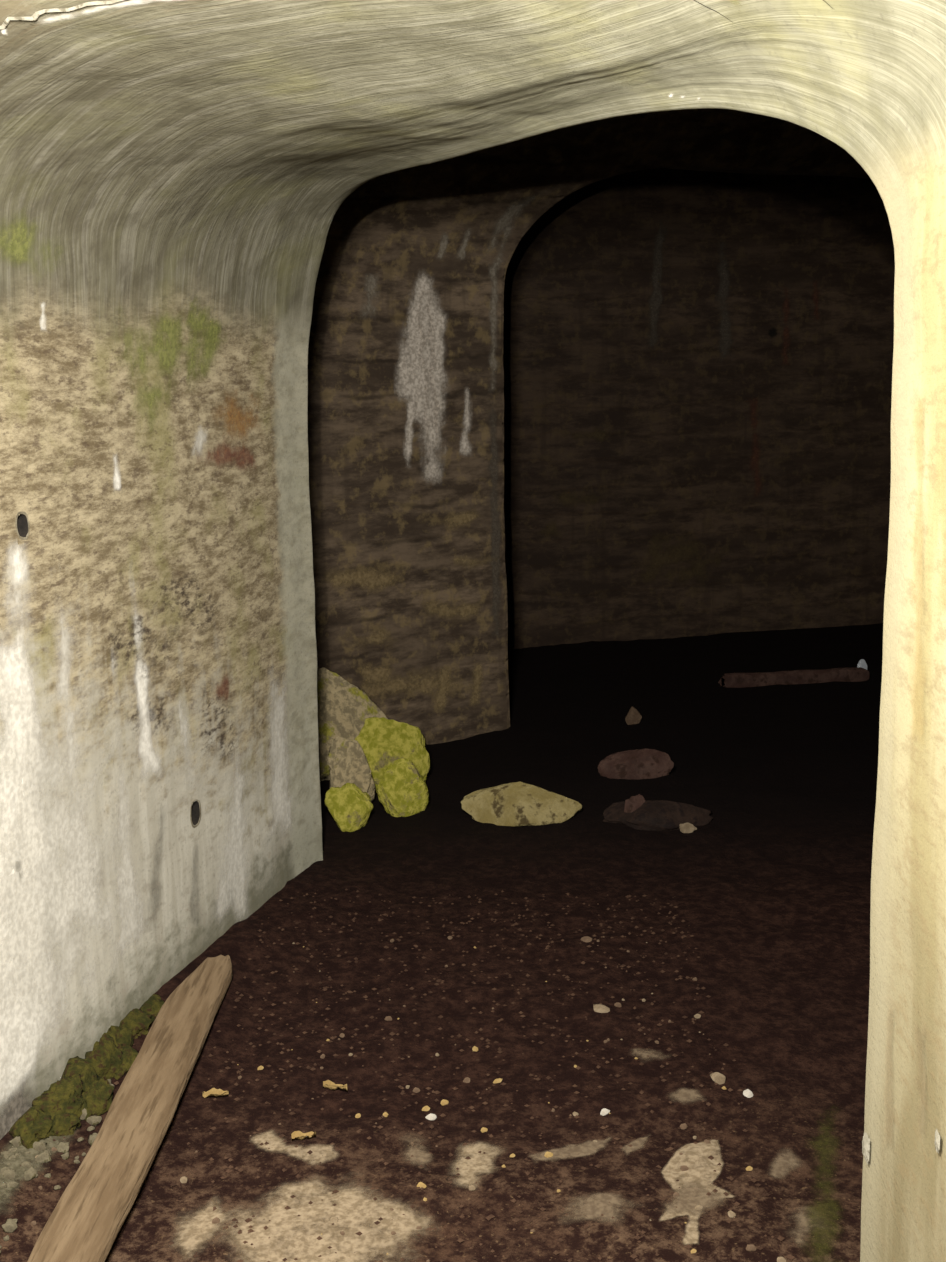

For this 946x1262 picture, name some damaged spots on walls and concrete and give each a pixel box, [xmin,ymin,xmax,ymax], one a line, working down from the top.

water stain [396,275,446,481]
water stain [460,390,471,455]
water stain [10,548,26,601]
water stain [164,579,214,622]
water stain [111,616,168,771]
water stain [271,689,291,828]
water stain [0,630,138,1102]
water stain [218,775,245,915]